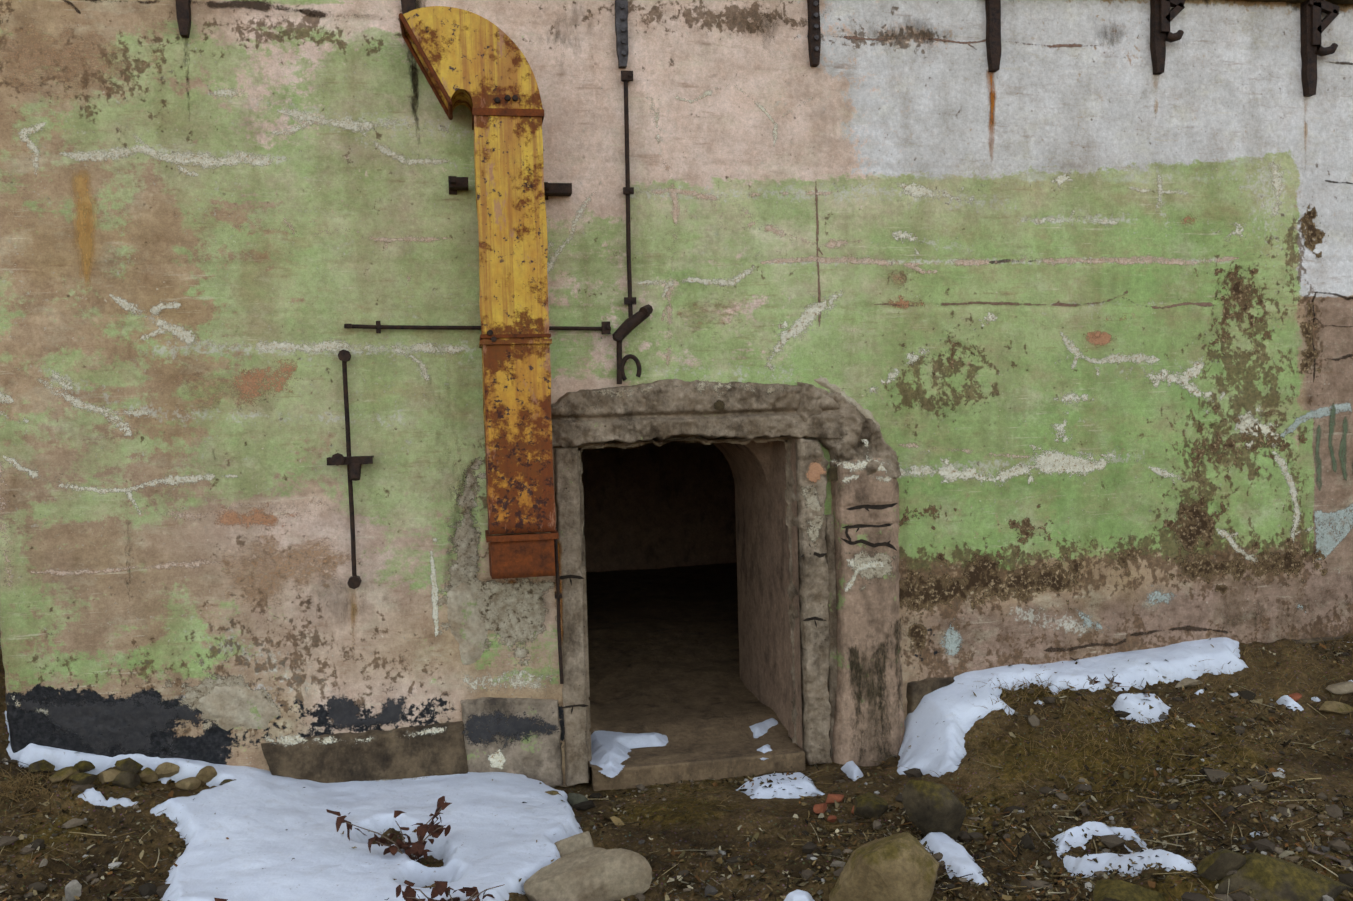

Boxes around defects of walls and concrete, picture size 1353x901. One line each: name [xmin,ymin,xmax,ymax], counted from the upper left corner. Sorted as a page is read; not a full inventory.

spalling [1301,206,1329,258]
peeling [869,336,976,395]
spalling [1203,264,1277,355]
spalling [1297,302,1321,374]
crack [801,439,1033,592]
spalling [1145,360,1328,608]
crack [803,617,826,627]